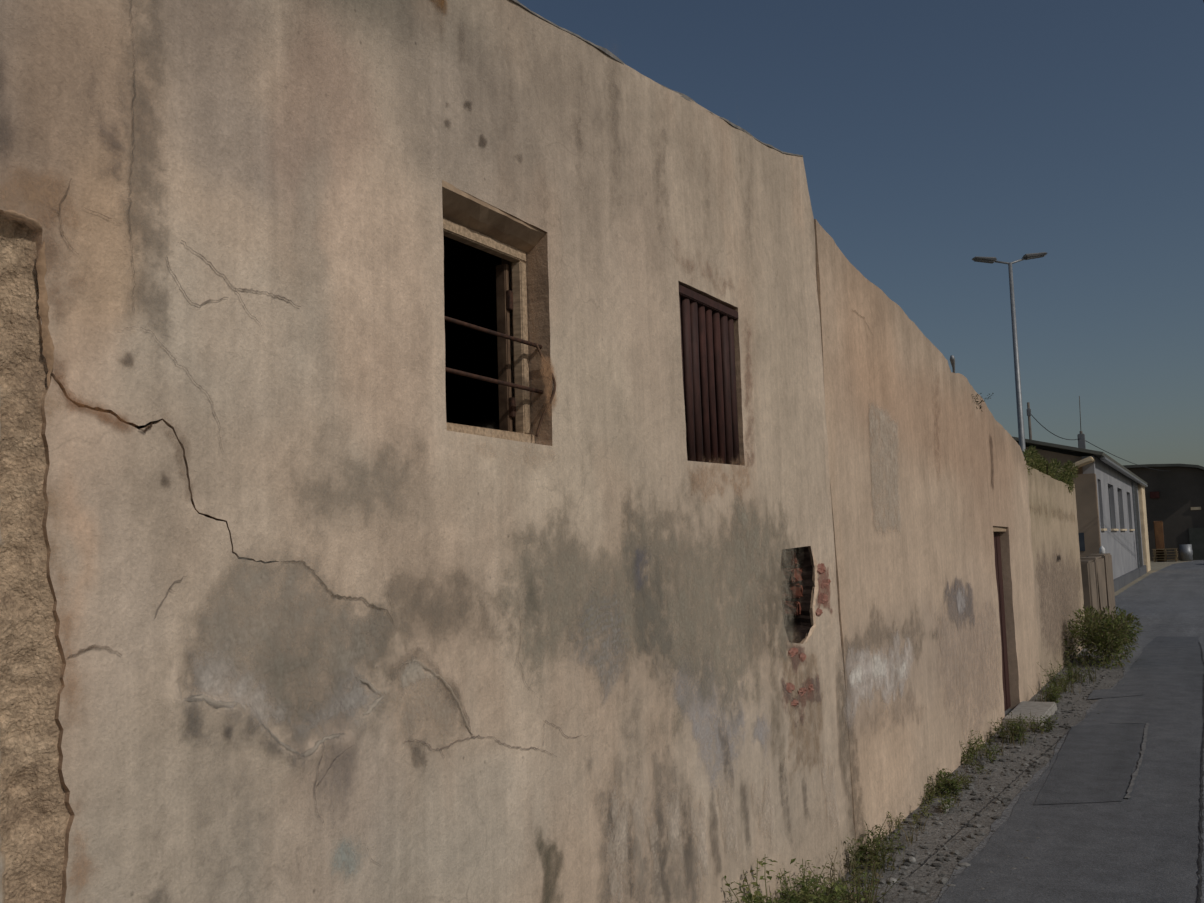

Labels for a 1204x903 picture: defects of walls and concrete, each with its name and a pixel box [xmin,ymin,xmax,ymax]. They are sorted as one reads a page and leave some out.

crack [166,240,301,324]
crack [46,372,225,522]
spalling [0,210,70,903]
crack [68,645,122,658]
crack [232,552,394,623]
crack [406,706,588,756]
leakage [506,502,788,903]
hole [781,547,832,762]